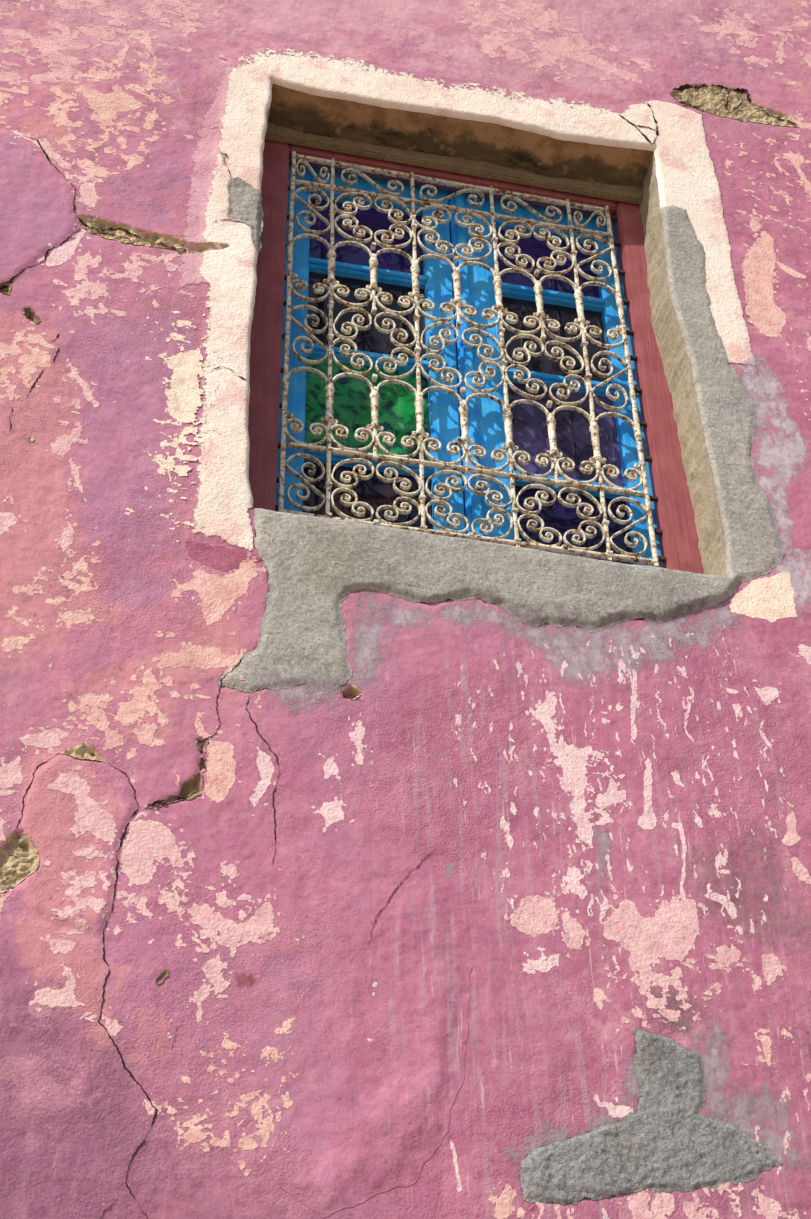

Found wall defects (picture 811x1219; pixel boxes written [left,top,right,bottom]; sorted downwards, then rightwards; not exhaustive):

crack [0,134,239,286]
peeling [456,0,811,420]
peeling [0,307,116,502]
peeling [37,224,230,542]
peeling [1,509,112,659]
crack [16,657,280,1219]
peeling [0,551,301,1177]
peeling [452,572,811,1033]
peeling [484,1179,574,1219]
peeling [594,1094,634,1118]
peeling [602,1180,807,1219]
peeling [741,1027,811,1175]